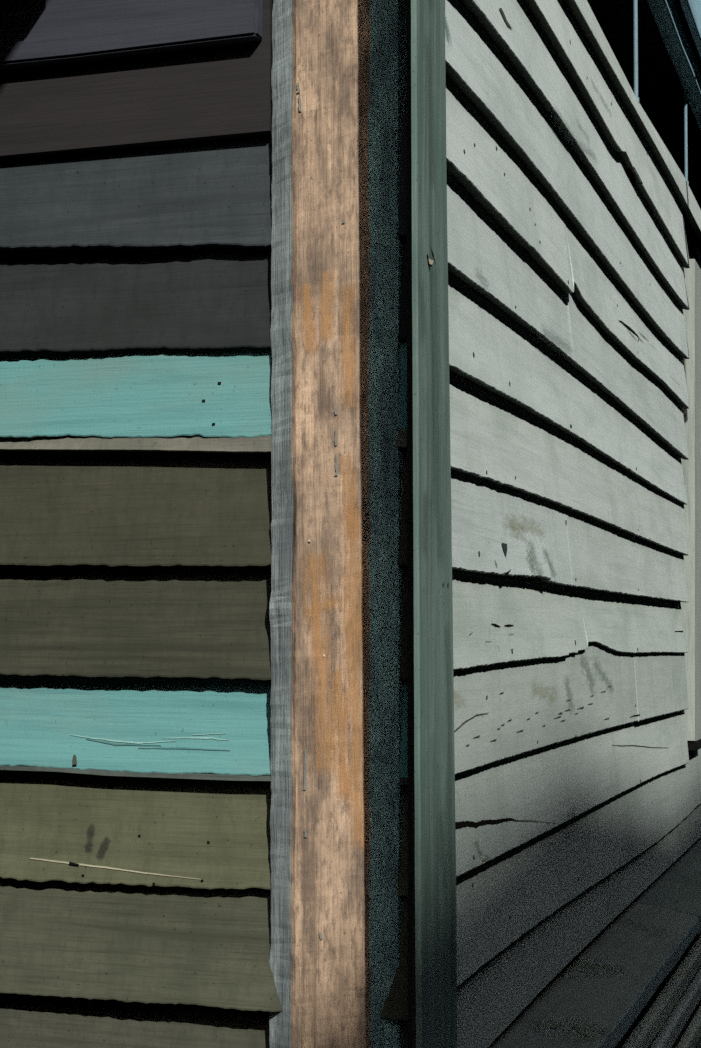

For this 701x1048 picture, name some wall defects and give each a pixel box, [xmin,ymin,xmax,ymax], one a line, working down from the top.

crack [455,816,550,829]